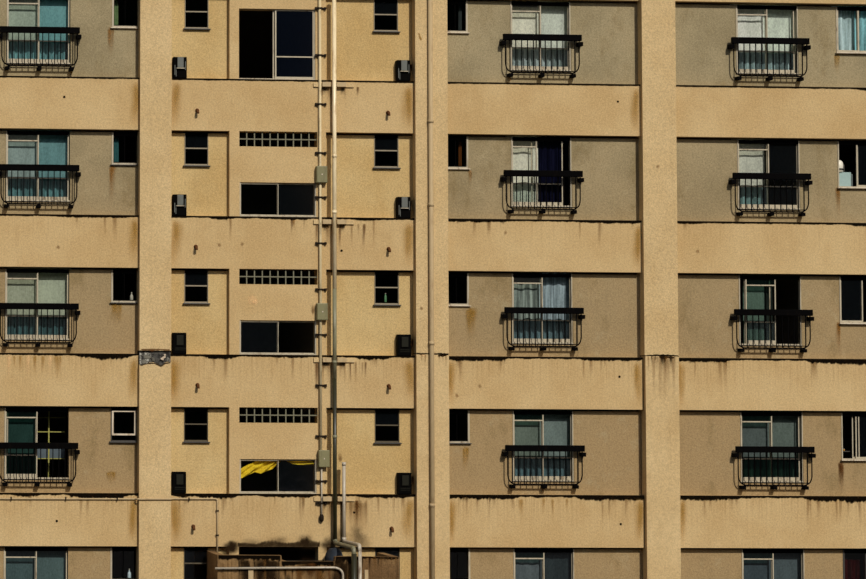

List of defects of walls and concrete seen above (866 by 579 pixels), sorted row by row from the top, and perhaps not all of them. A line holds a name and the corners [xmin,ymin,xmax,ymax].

spalling [139,349,171,367]
water stain [171,354,415,374]